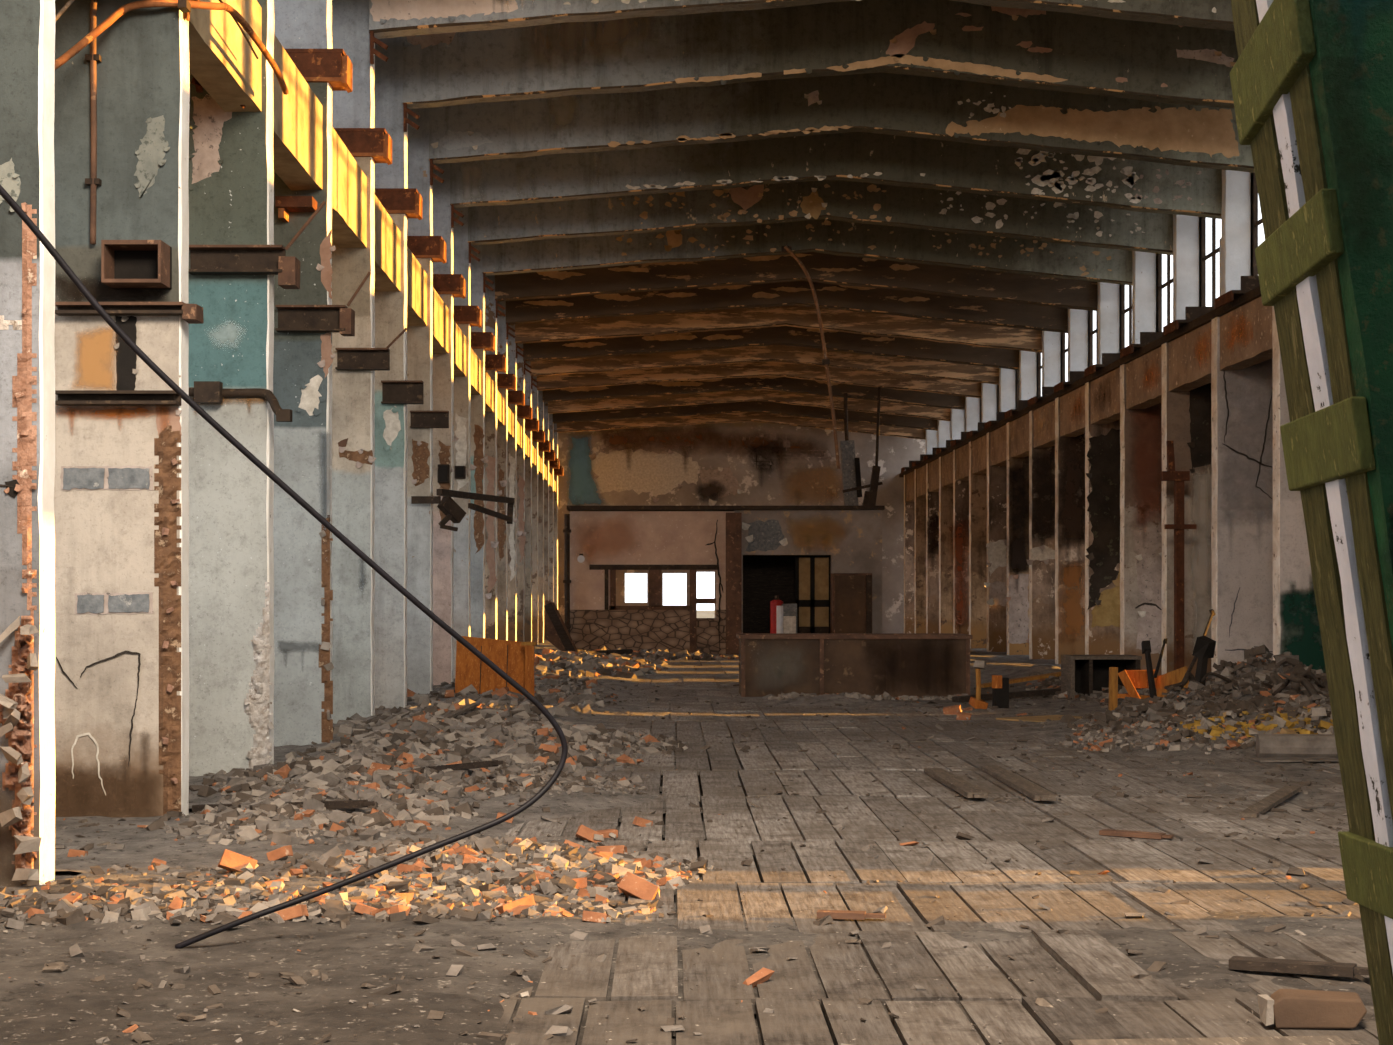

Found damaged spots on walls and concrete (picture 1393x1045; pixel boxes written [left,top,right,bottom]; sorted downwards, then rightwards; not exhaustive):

peeling [134,115,170,199]
peeling [188,94,232,190]
peeling [608,172,919,298]
peeling [784,21,1239,276]
spalling [0,158,42,881]
spalling [154,406,182,815]